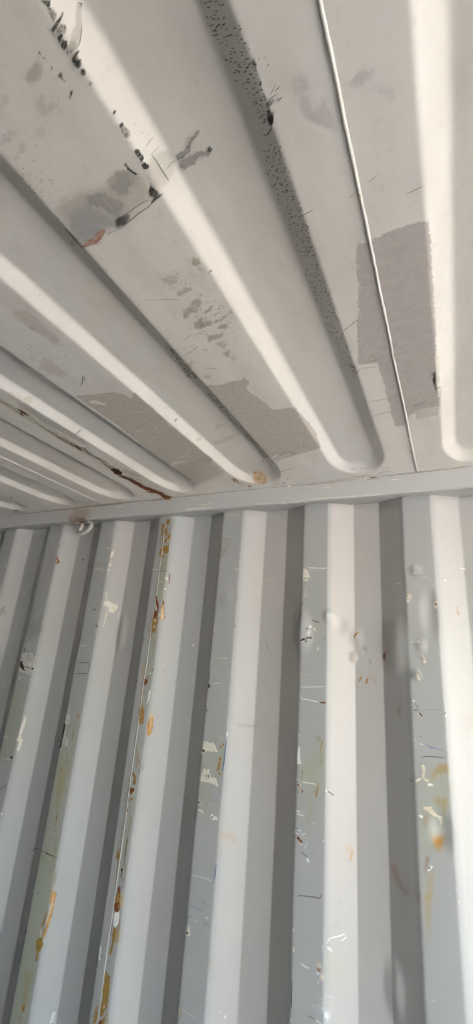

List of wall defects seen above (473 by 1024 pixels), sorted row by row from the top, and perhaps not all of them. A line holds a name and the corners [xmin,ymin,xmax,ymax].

corrosion [0,401,172,501]
corrosion [152,519,171,570]
corrosion [143,596,165,645]
corrosion [135,665,154,736]
peeling [200,769,218,786]
peeling [201,741,218,754]
corrosion [35,870,57,961]
corrosion [93,745,144,1024]